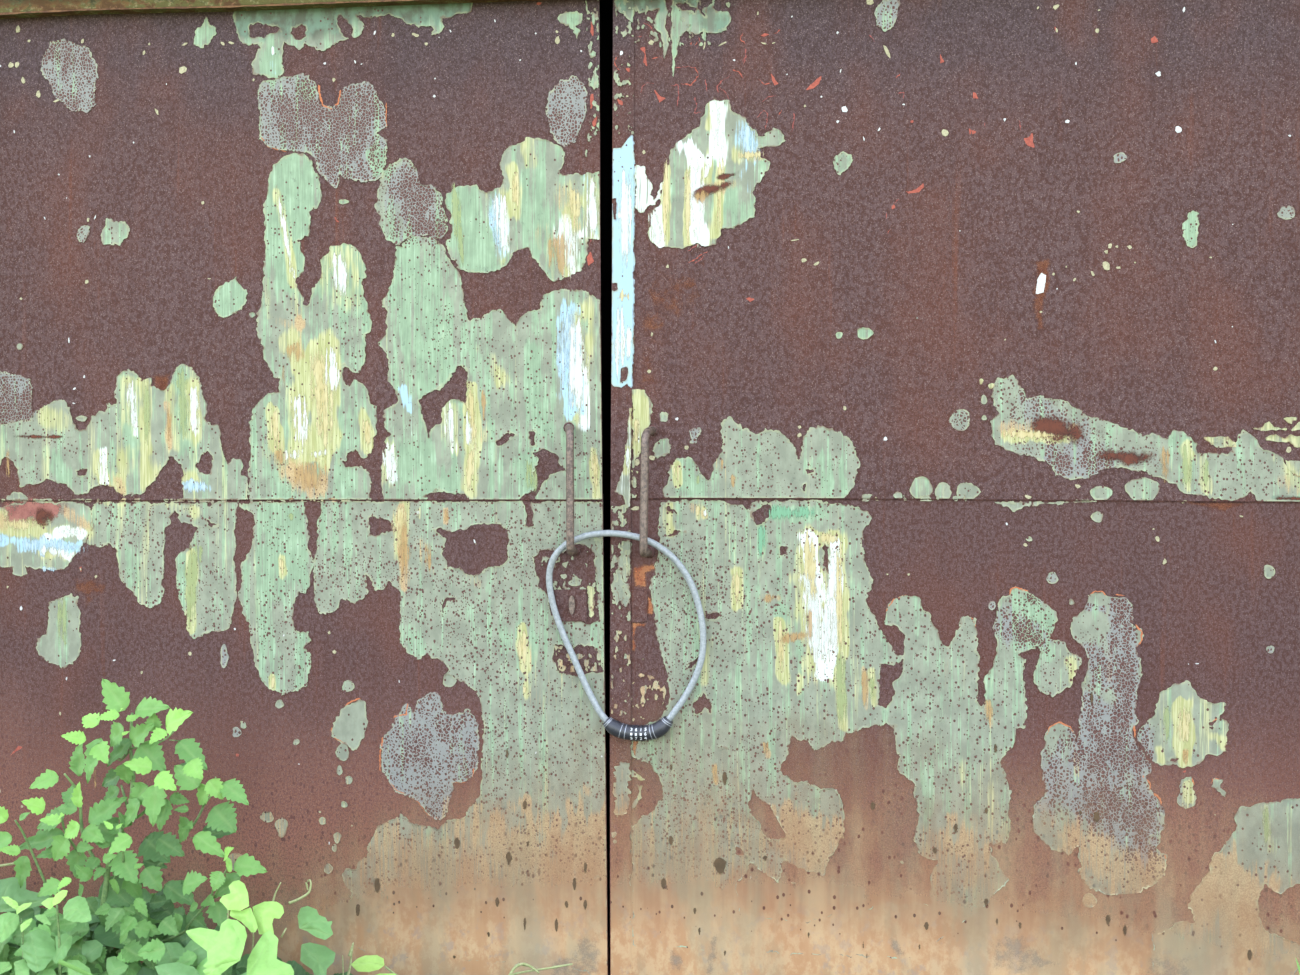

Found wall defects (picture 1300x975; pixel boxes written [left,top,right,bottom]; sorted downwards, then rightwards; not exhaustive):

peeling [614,0,731,76]
peeling [874,0,901,32]
peeling [613,56,634,111]
peeling [833,151,853,175]
peeling [1182,211,1199,248]
peeling [611,100,786,532]
peeling [836,327,874,340]
peeling [0,0,626,897]
peeling [949,375,1300,523]
corrosion [633,566,655,650]
peeling [611,416,1229,908]
peeling [1151,798,1300,970]